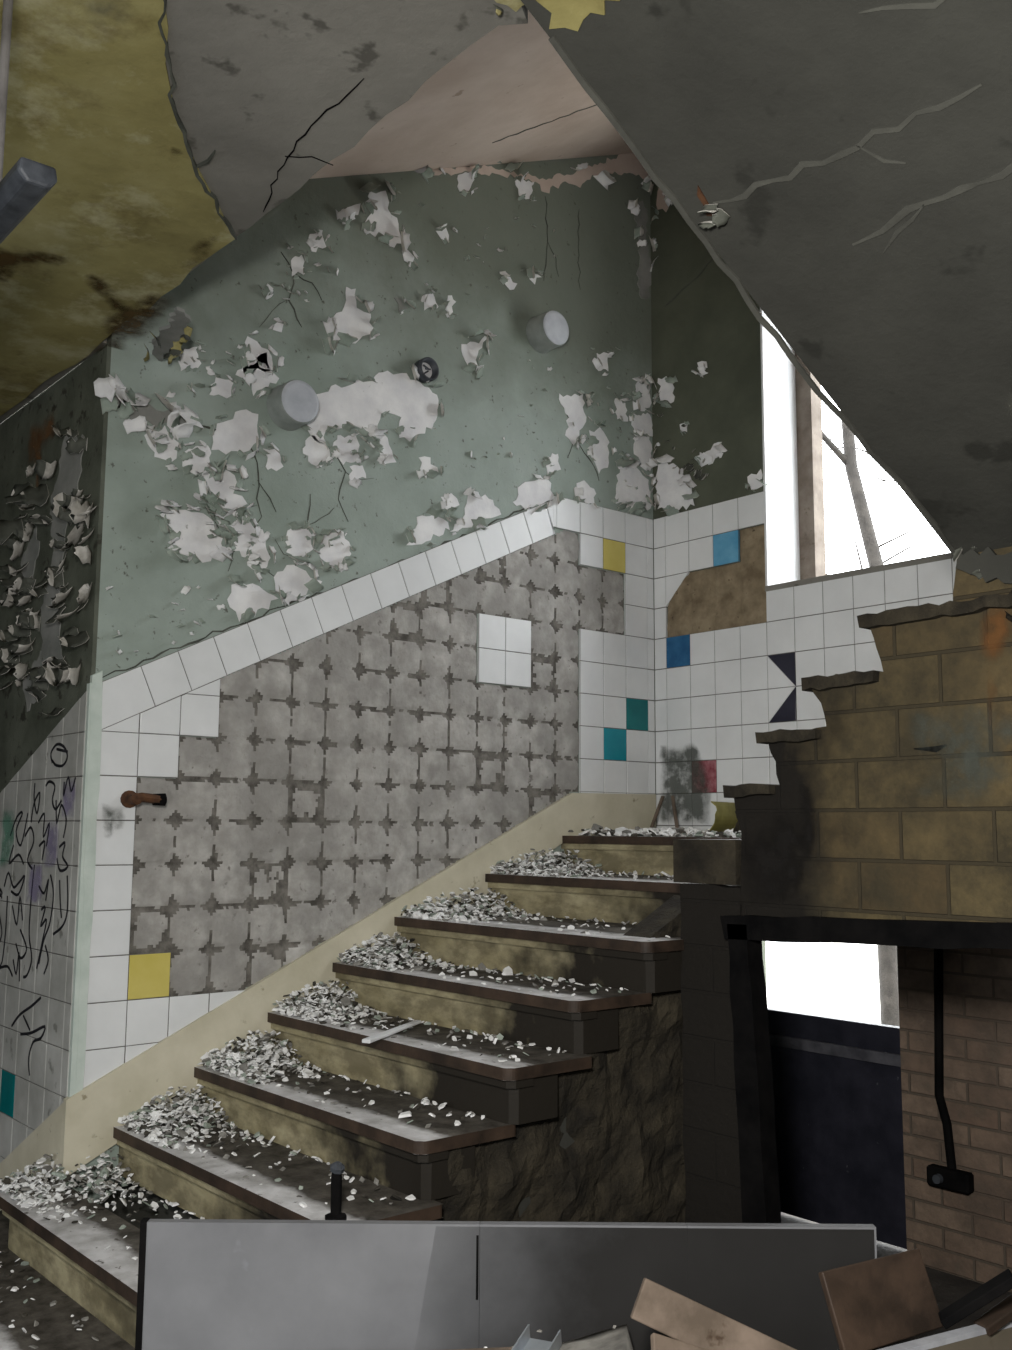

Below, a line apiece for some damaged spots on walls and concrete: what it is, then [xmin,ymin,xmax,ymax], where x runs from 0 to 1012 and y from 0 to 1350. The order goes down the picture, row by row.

crack [858,0,945,14]
crack [263,78,364,212]
crack [713,83,982,204]
leakage [0,251,61,280]
peeling [0,0,235,416]
leakage [90,277,165,351]
spalling [406,0,1012,594]
crack [852,163,1012,253]
peeling [93,307,357,645]
peeling [301,364,445,489]
peeling [0,425,113,715]
peeling [667,525,767,637]